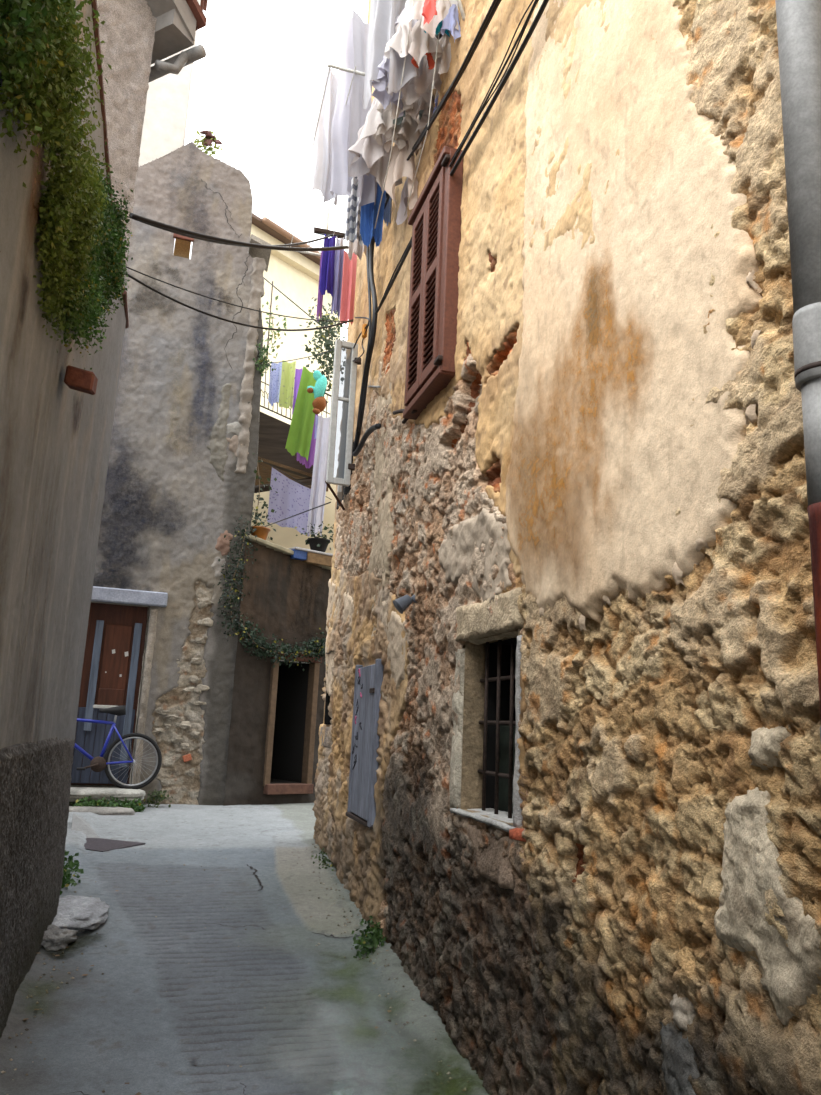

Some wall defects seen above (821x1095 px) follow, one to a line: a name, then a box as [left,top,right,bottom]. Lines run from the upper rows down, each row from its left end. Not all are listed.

water stain [93,457,177,589]
crack [201,179,250,368]
water stain [508,267,643,552]
spalling [334,0,821,1095]